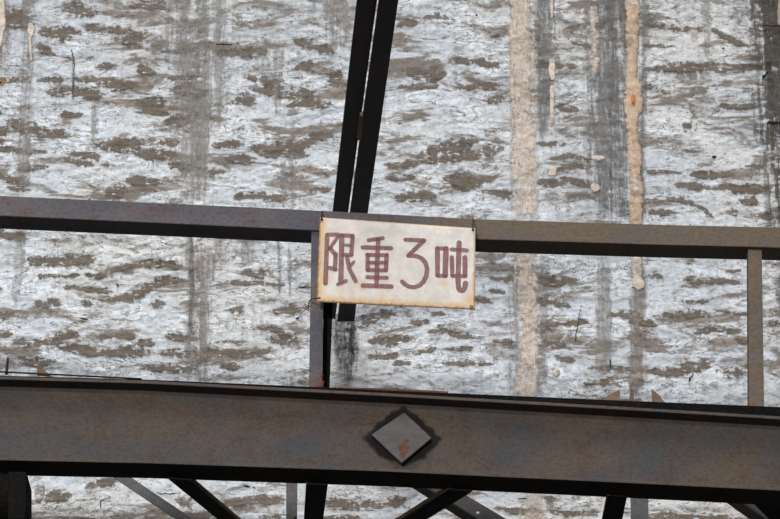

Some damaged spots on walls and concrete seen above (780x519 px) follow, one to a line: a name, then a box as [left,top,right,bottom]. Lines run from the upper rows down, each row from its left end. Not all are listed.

leakage [508,0,560,216]
leakage [741,0,780,228]
leakage [346,321,356,362]
leakage [509,253,548,397]